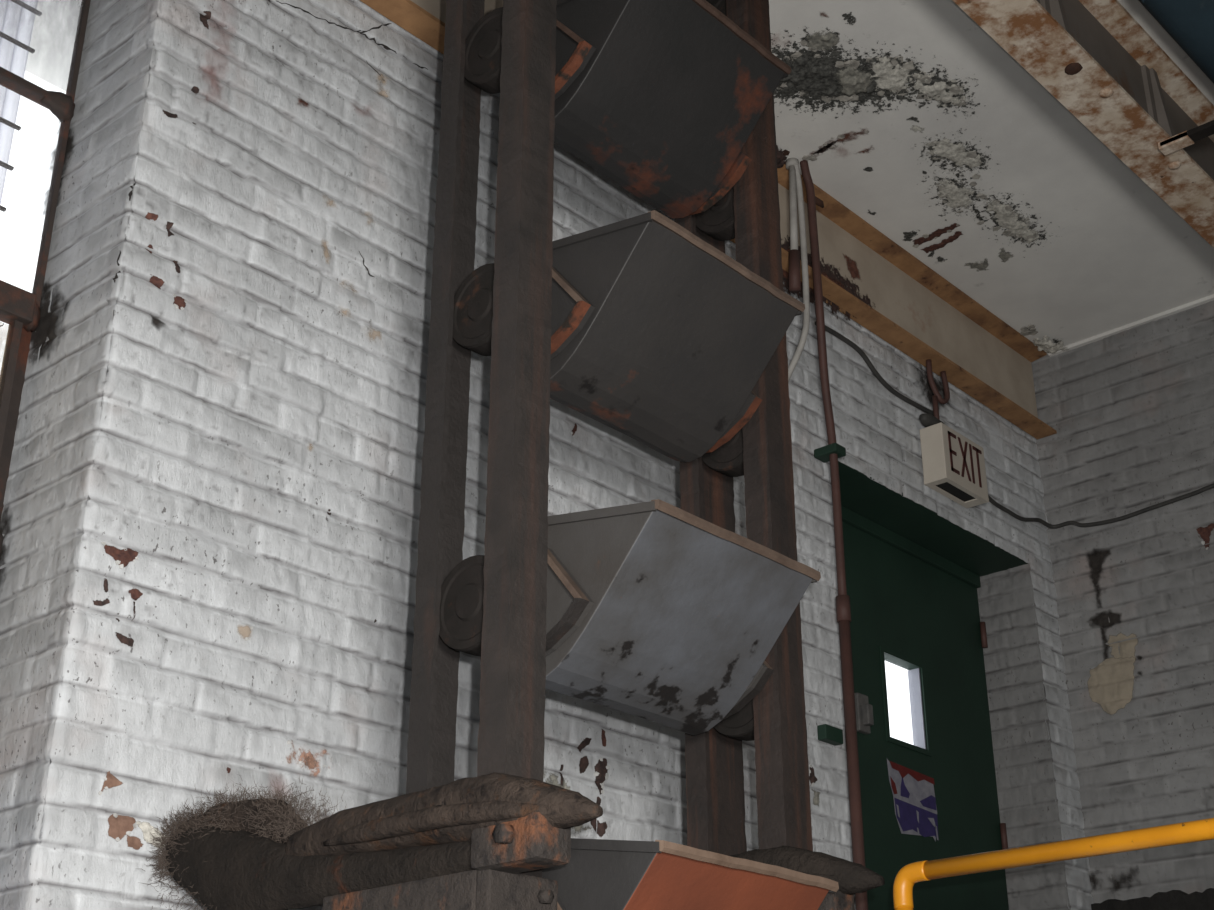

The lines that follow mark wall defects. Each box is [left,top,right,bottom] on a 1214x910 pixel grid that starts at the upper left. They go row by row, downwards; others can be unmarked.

crack [268,0,428,81]
peeling [145,212,174,237]
rust [902,223,964,257]
peeling [149,274,188,310]
peeling [101,542,139,569]
peeling [93,578,143,647]
spalling [98,771,123,795]
peeling [543,764,570,790]
peeling [572,729,610,837]
spalling [108,813,166,850]